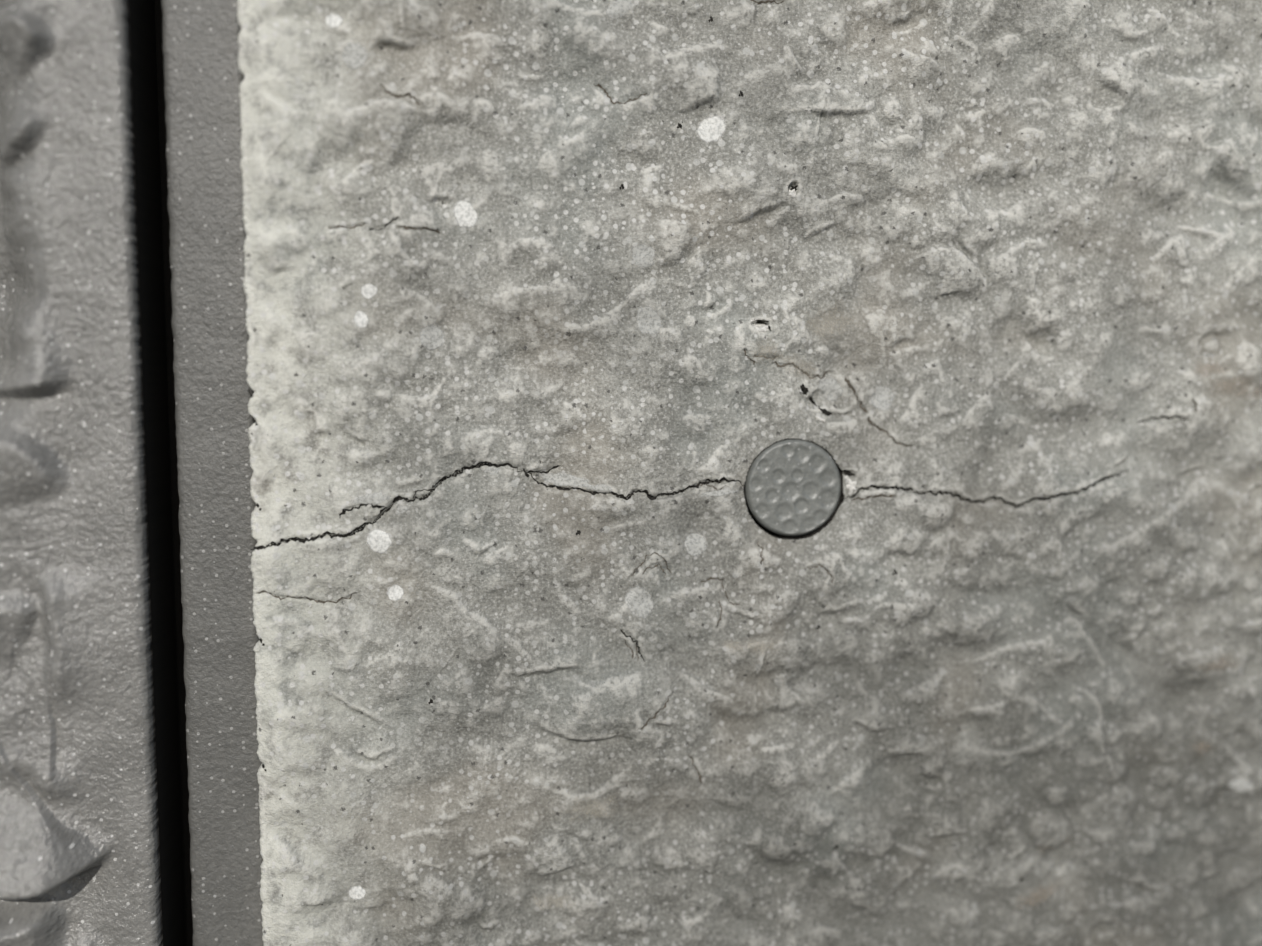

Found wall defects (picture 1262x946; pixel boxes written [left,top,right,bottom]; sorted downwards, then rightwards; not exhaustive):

crack [744,349,912,447]
crack [251,461,745,550]
crack [843,457,1130,508]